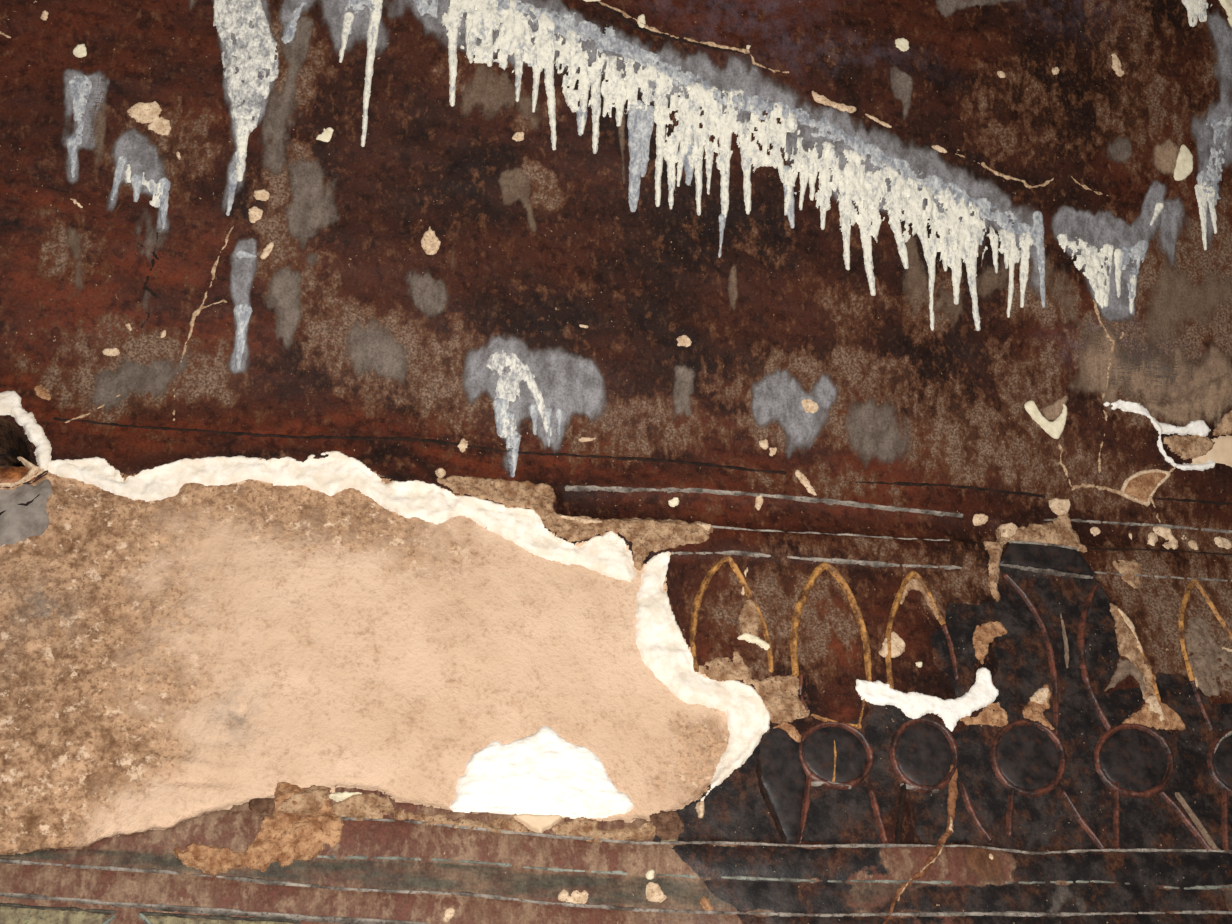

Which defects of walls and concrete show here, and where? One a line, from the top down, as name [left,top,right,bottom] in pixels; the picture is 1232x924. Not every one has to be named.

crack [584,0,789,73]
leakage [63,69,171,255]
leakage [213,0,1232,387]
crack [812,91,892,128]
crack [932,145,1108,196]
leakage [463,335,606,477]
leakage [751,369,837,457]
spalling [1024,326,1232,471]
spalling [0,418,730,875]
spalling [697,600,810,743]
spalling [879,632,906,658]
crack [883,764,958,924]